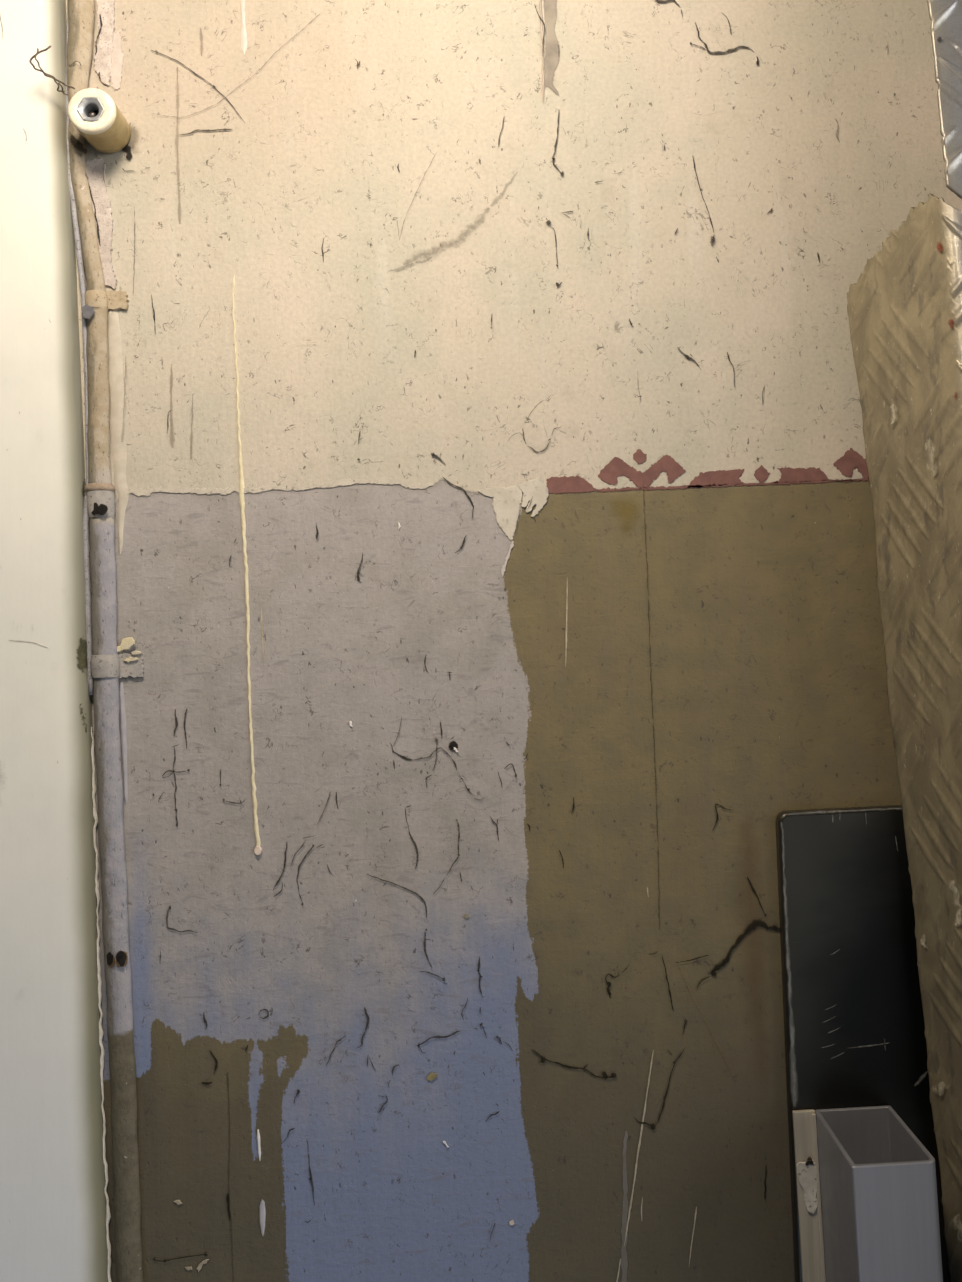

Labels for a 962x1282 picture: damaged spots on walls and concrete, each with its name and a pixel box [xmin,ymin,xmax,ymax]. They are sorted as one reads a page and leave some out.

peeling [93,0,125,91]
peeling [85,158,117,290]
peeling [126,478,433,497]
peeling [479,477,549,577]
crack [605,489,780,1130]
crack [326,718,616,1113]